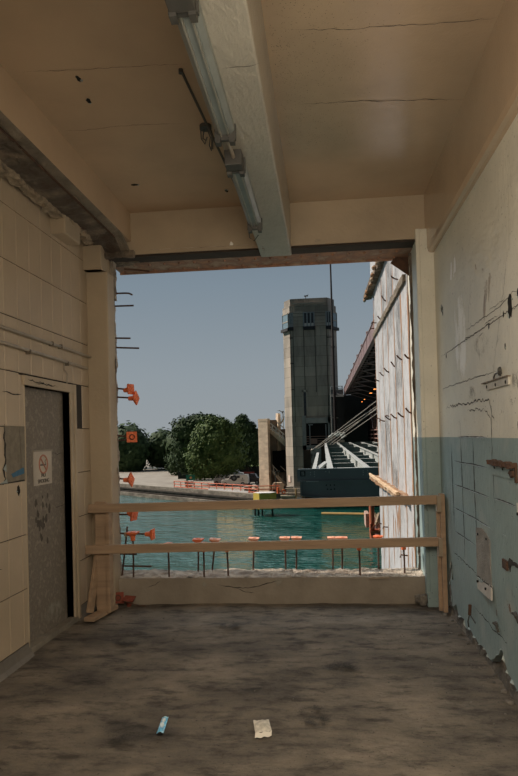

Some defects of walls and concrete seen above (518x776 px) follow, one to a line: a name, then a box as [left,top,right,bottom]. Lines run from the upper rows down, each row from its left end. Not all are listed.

crack [309,19,479,30]
corrosion [373,272,416,569]
crack [443,258,518,443]
spalling [442,562,518,706]